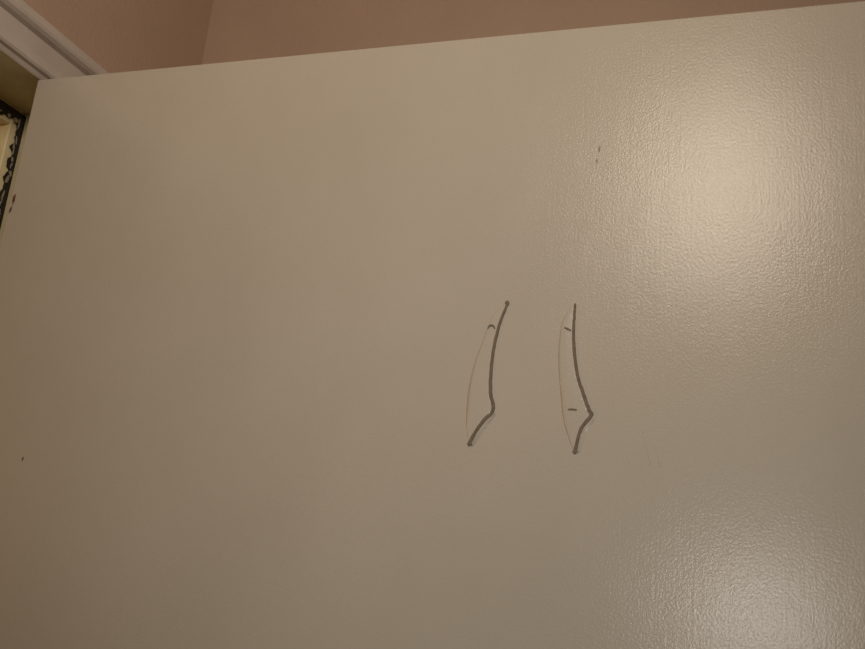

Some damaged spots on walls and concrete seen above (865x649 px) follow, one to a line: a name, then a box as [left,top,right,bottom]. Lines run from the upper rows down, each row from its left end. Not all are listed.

crack [466,300,509,446]
crack [558,303,595,453]